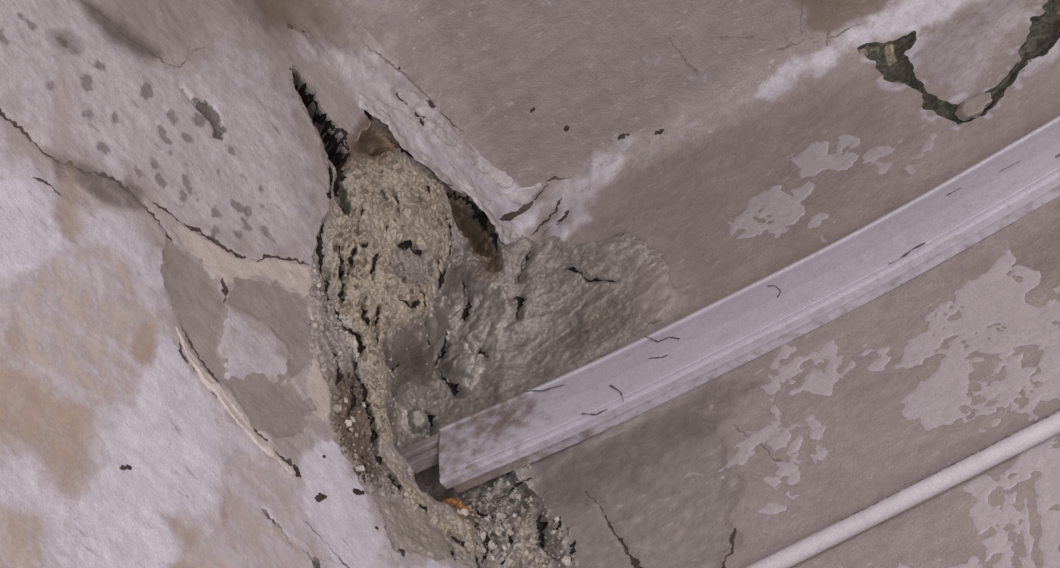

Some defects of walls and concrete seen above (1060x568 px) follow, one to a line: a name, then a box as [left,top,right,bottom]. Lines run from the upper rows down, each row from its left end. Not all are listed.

crack [0,108,124,203]
peeling [728,133,937,243]
crack [143,203,310,303]
crack [179,327,219,398]
peeling [174,326,302,478]
spalling [289,65,671,568]
peeling [718,249,1060,515]
crack [262,509,350,568]
crack [585,491,643,568]
peeling [948,433,1060,568]